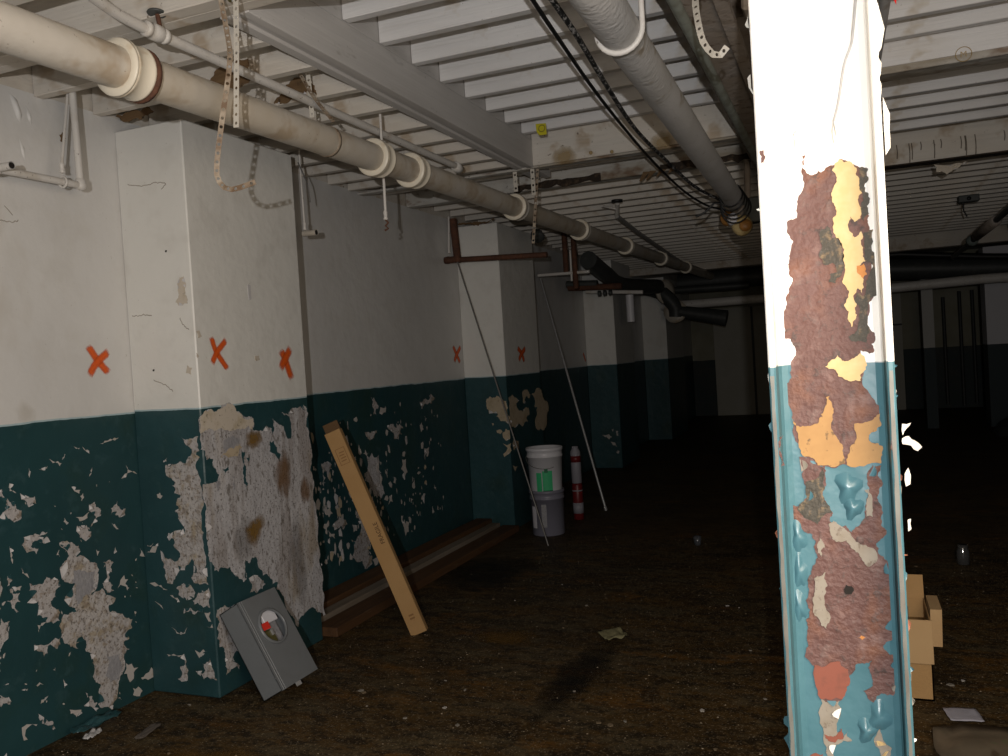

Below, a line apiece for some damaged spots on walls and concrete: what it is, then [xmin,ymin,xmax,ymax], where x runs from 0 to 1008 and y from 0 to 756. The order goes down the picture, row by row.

corrosion [566,280,623,291]
peeling [340,394,444,535]
peeling [486,388,549,457]
peeling [784,155,922,756]
peeling [22,696,55,740]
peeling [0,483,153,717]
peeling [167,650,217,682]
peeling [135,403,379,673]
peeling [768,373,795,756]